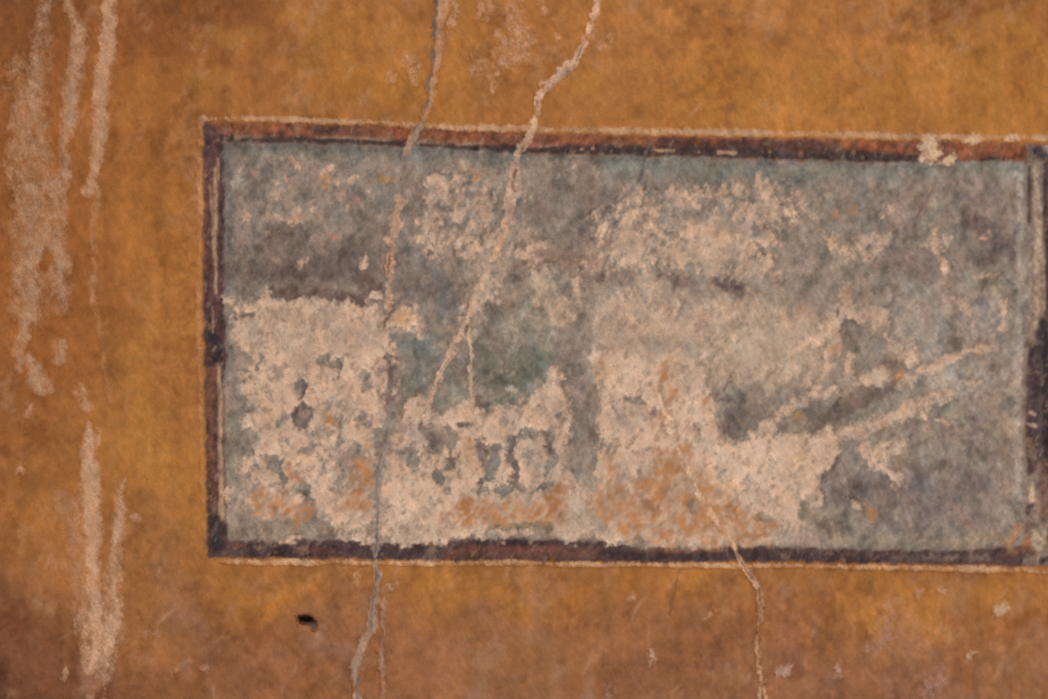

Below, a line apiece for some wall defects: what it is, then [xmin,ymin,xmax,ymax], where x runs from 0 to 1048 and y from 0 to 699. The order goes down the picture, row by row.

peeling [916,131,984,167]
water stain [0,0,143,699]
crack [348,0,603,699]
peeling [218,158,1012,553]
crack [653,384,769,699]